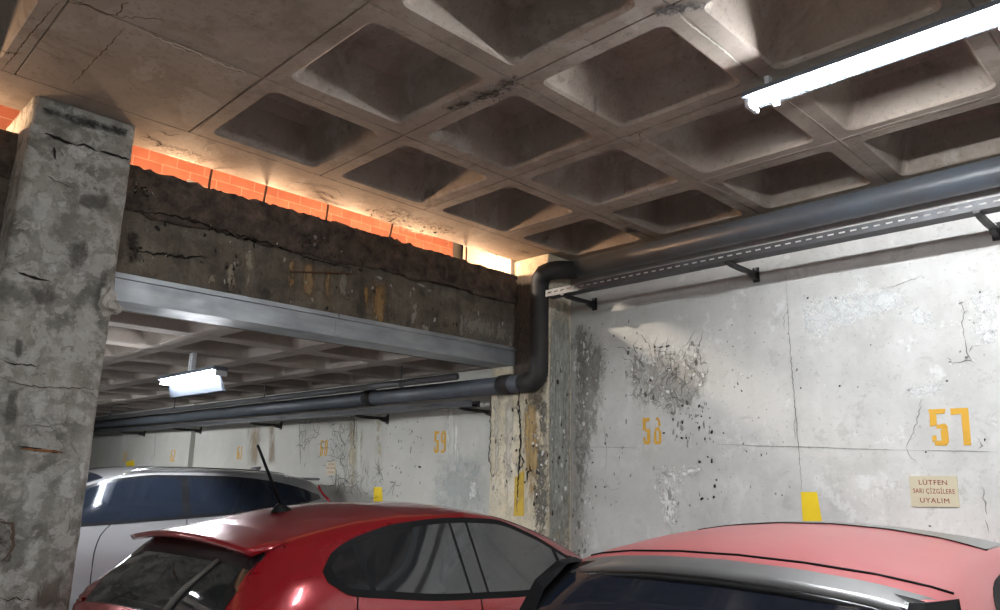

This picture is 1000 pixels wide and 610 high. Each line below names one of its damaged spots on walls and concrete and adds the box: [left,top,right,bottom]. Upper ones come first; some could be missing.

crack [2,1,369,157]
crack [45,133,129,189]
crack [133,210,353,268]
crack [946,300,974,363]
crack [593,332,708,409]
crack [298,411,398,499]
crack [516,392,532,505]
leakage [528,318,605,549]
crack [880,401,950,461]